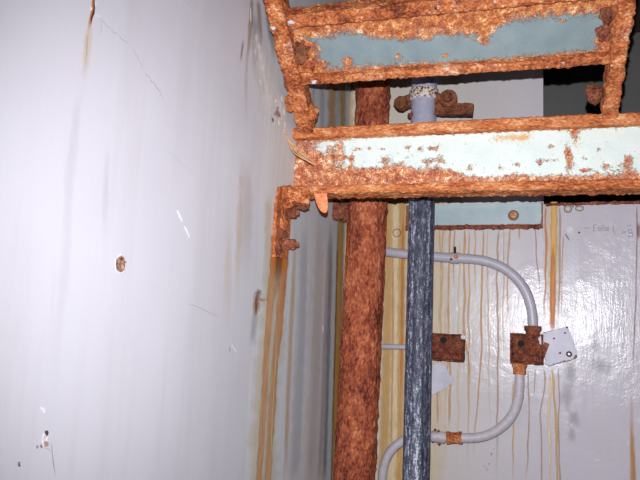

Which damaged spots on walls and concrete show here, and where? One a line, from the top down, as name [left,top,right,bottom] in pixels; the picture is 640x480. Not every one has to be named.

corrosion [89,0,100,24]
corrosion [329,83,352,127]
corrosion [386,197,408,249]
corrosion [254,236,288,480]
corrosion [331,221,347,480]
corrosion [381,256,406,456]
corrosion [435,202,563,407]
corrosion [387,447,403,480]
corrosion [540,372,561,480]